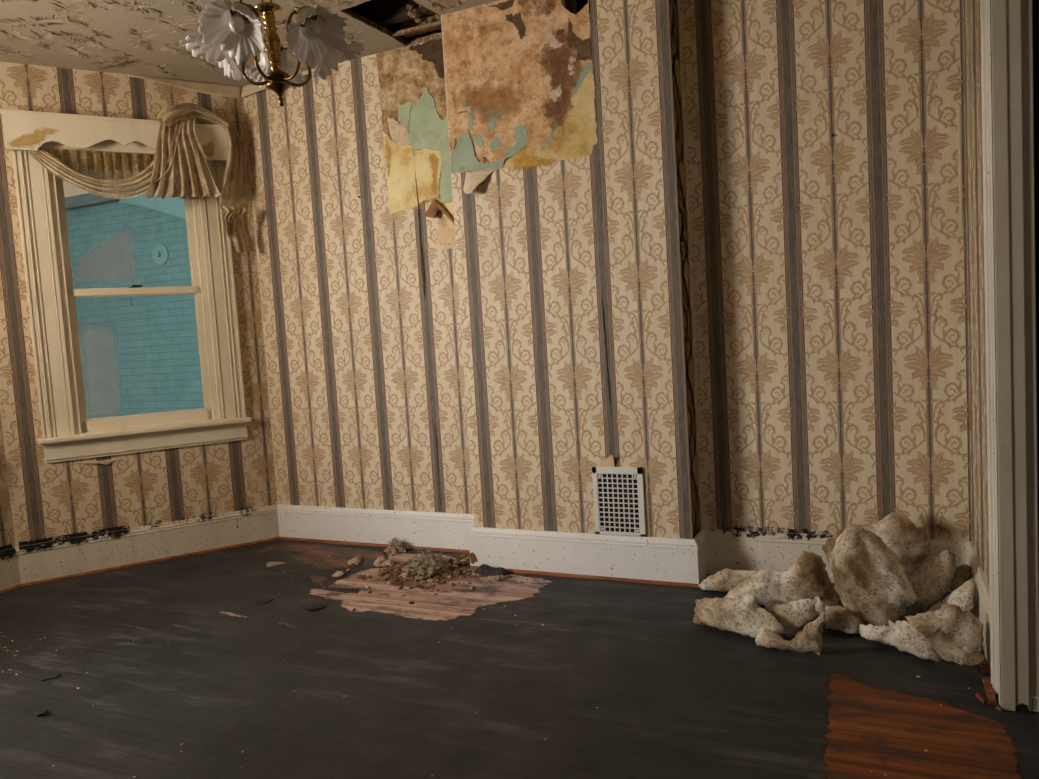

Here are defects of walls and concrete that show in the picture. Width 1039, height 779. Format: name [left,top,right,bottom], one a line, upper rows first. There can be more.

spalling [340,0,445,78]
spalling [489,0,526,39]
spalling [545,0,593,102]
peeling [461,99,529,159]
damp [0,522,130,560]
damp [144,507,255,529]
damp [710,526,833,540]